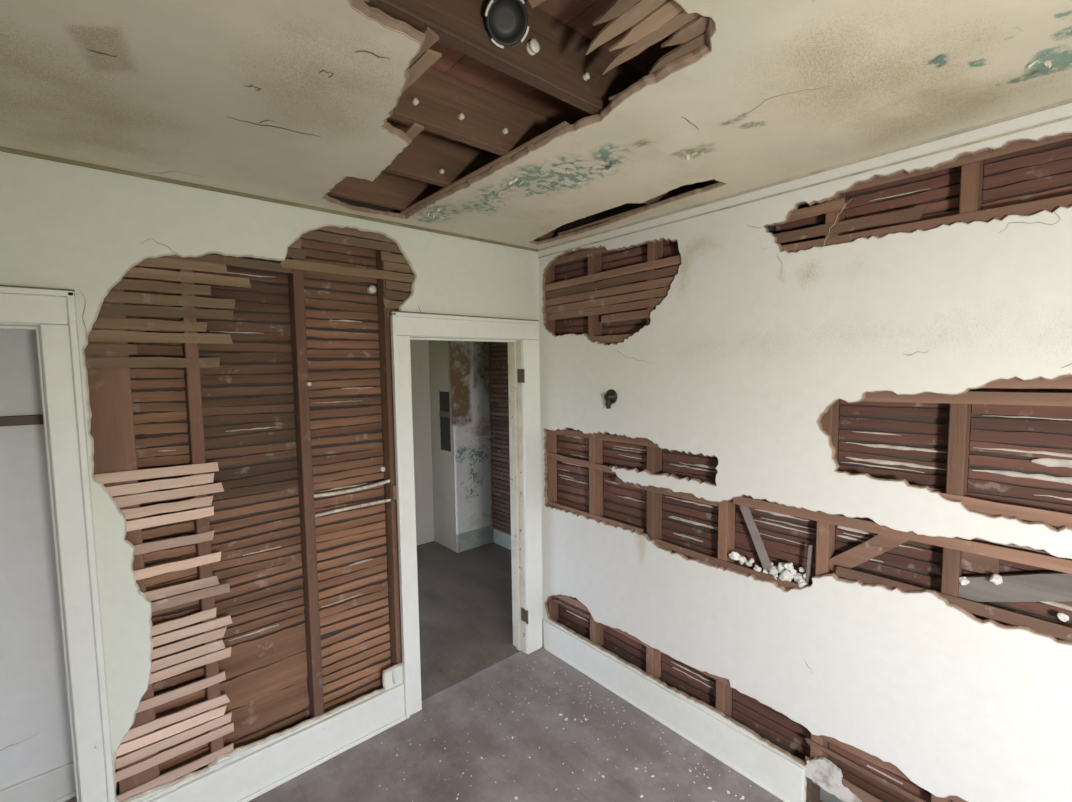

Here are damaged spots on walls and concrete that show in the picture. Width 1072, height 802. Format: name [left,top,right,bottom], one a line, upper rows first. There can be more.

flaking render [321,0,718,223]
flaking render [530,179,726,346]
peeling [720,112,769,130]
flaking render [764,131,1072,253]
flaking render [81,224,417,802]
flaking render [543,427,1072,646]
flaking render [816,374,1072,533]
flaking render [544,594,968,802]